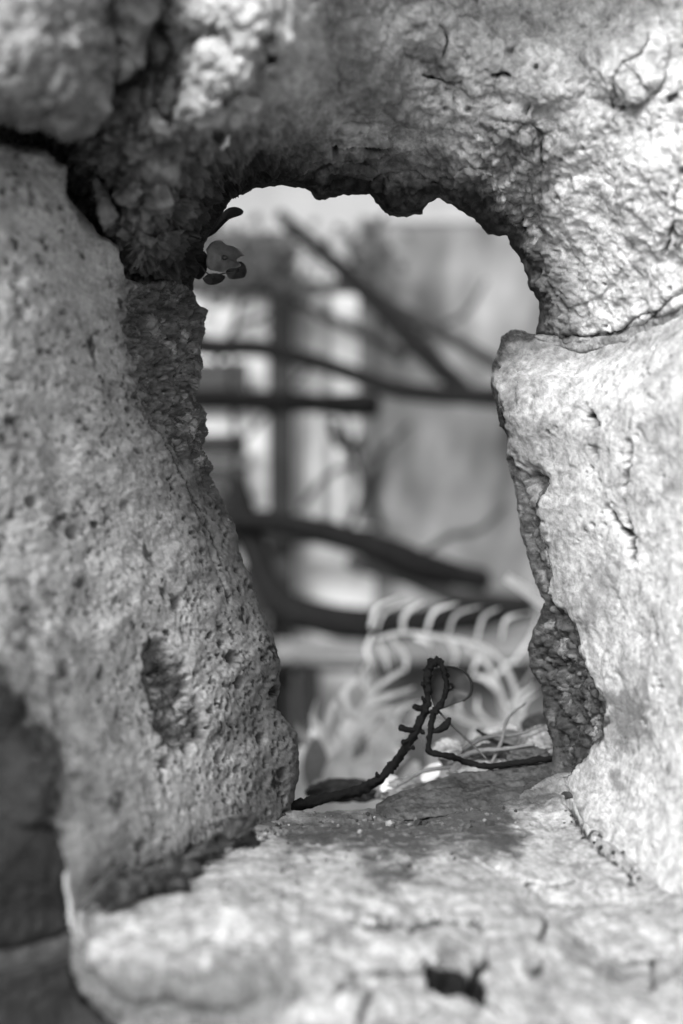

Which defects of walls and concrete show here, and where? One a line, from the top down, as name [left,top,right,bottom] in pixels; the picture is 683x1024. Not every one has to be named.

peeling [472,118,571,246]
spalling [492,330,536,369]
spalling [490,383,506,433]
crack [615,513,638,557]
spalling [506,455,610,776]